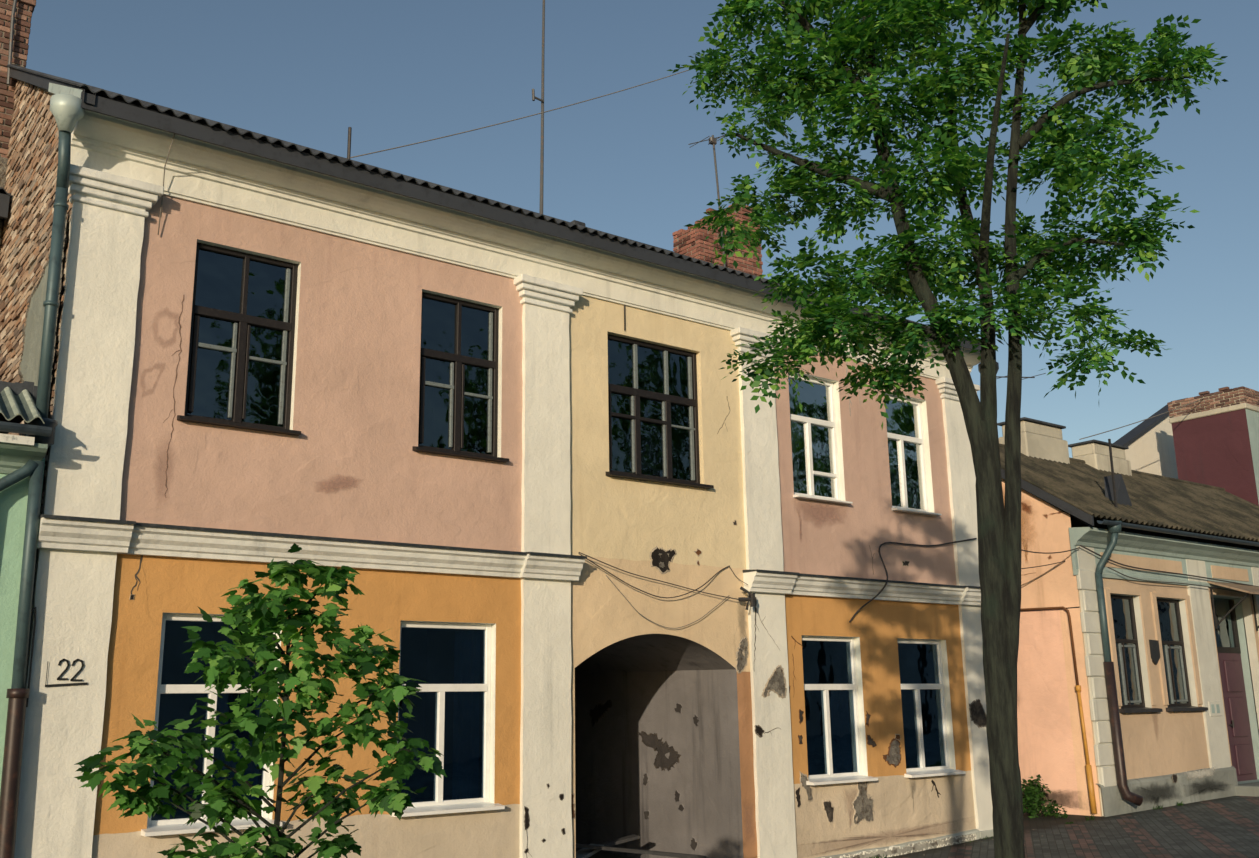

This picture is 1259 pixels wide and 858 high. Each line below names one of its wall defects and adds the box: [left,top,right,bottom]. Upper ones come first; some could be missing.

crack [163,297,184,497]
damp [1021,503,1030,559]
crack [131,555,143,595]
spalling [735,636,749,674]
spalling [761,665,790,699]
spalling [969,699,986,728]
spalling [638,731,681,787]
spalling [866,711,901,768]
spalling [674,789,685,812]
spalling [795,771,834,825]
spalling [851,781,875,828]